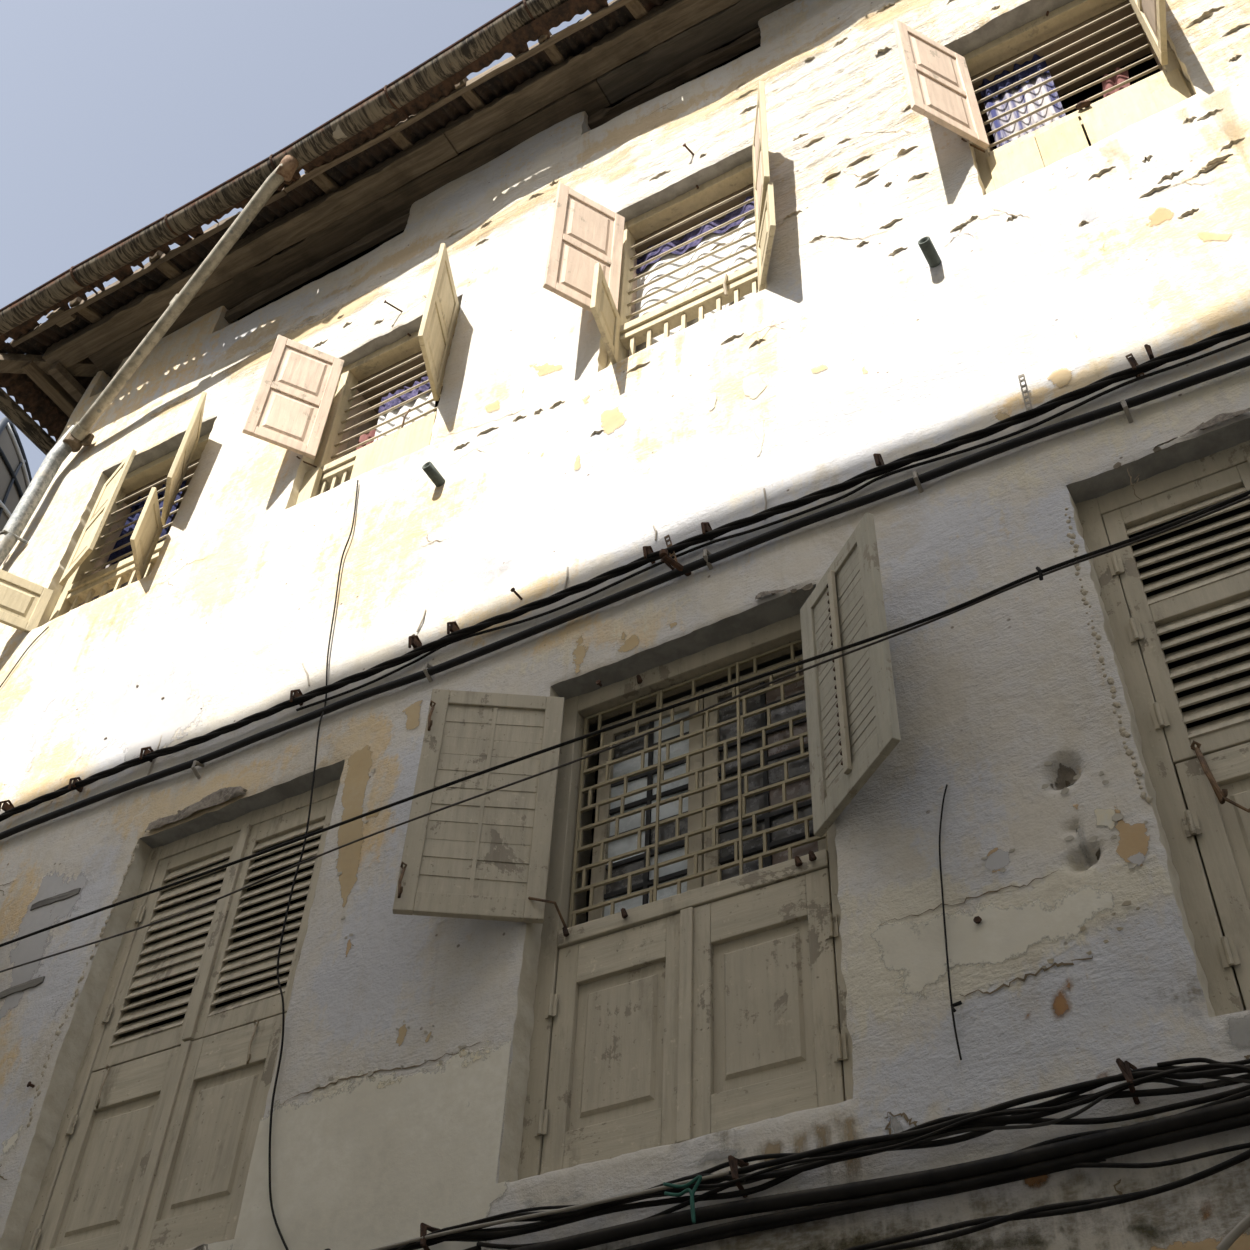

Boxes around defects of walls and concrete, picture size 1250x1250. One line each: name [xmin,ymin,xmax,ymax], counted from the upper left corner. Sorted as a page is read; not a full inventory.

flaking render [1185,6,1224,28]
flaking render [1183,108,1223,123]
flaking render [793,133,852,148]
flaking render [822,154,892,187]
flaking render [1139,137,1245,198]
crack [942,208,1030,248]
peeling [1148,207,1199,226]
peeling [590,406,626,437]
peeling [74,662,213,764]
flaking render [1041,761,1082,809]
peeling [336,745,380,920]
peeling [0,872,87,1019]